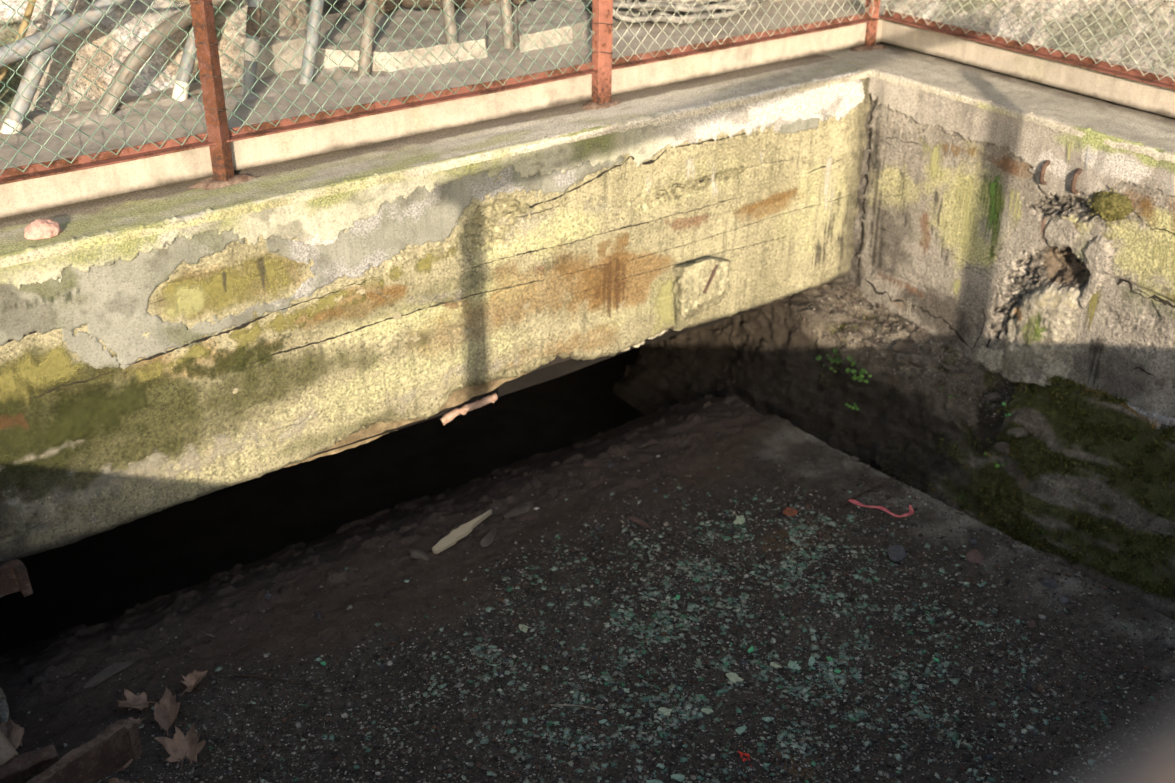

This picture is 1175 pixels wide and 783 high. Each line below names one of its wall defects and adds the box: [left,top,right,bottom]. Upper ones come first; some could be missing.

flaking render [0,68,1175,374]
damp [931,174,1021,259]
crack [1114,277,1175,308]
spalling [331,337,569,446]
damp [1088,339,1104,385]